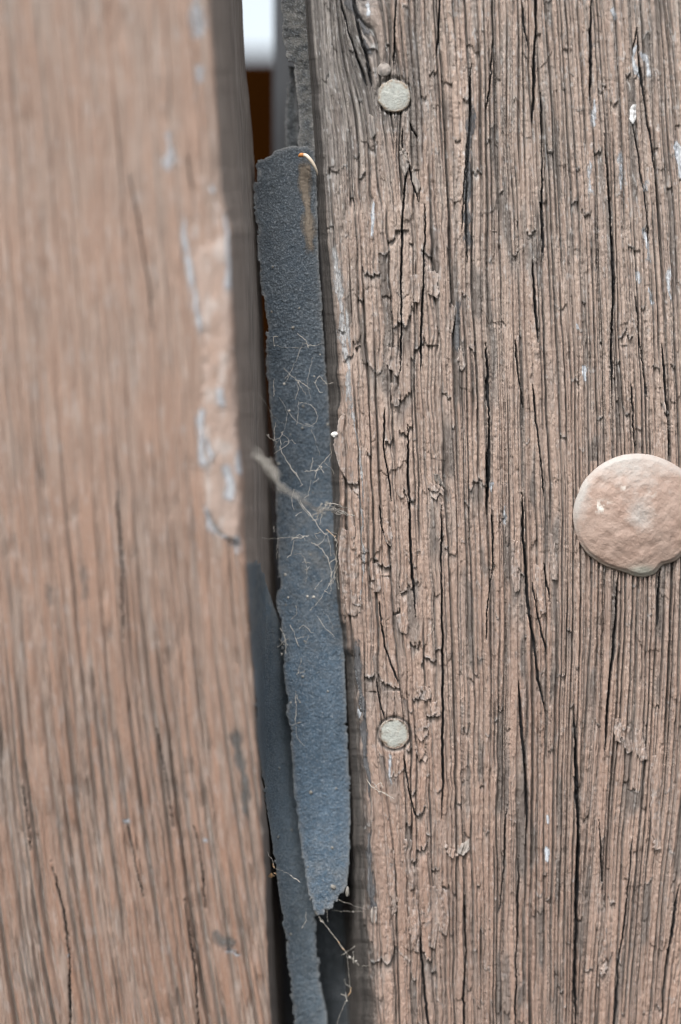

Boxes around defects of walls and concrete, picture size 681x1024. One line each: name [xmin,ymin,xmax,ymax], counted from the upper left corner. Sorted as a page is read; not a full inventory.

peeling [333,413,360,496]
peeling [338,525,381,617]
peeling [386,346,401,407]
crack [379,410,416,610]
peeling [396,612,409,634]
crack [400,123,426,365]
crack [438,519,446,809]
crack [485,347,494,636]
crack [499,0,550,1024]
crack [604,582,617,750]
crack [604,144,669,455]
crack [572,717,632,1024]